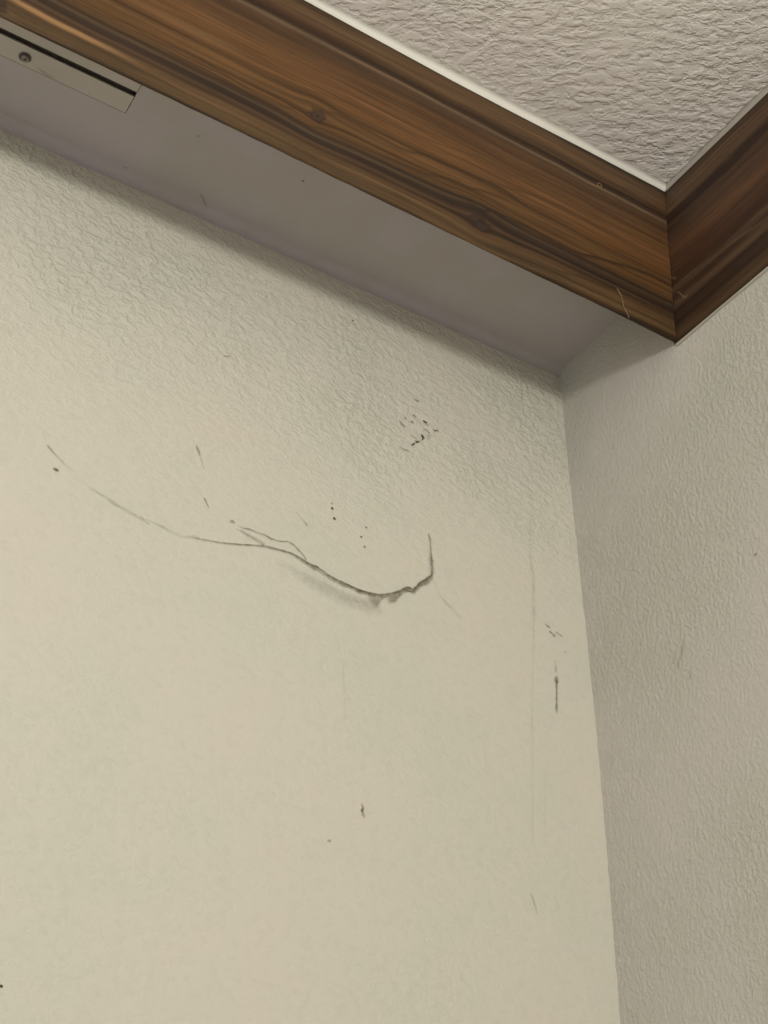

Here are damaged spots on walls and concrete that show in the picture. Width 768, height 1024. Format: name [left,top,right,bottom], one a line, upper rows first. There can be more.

crack [233,528,430,596]